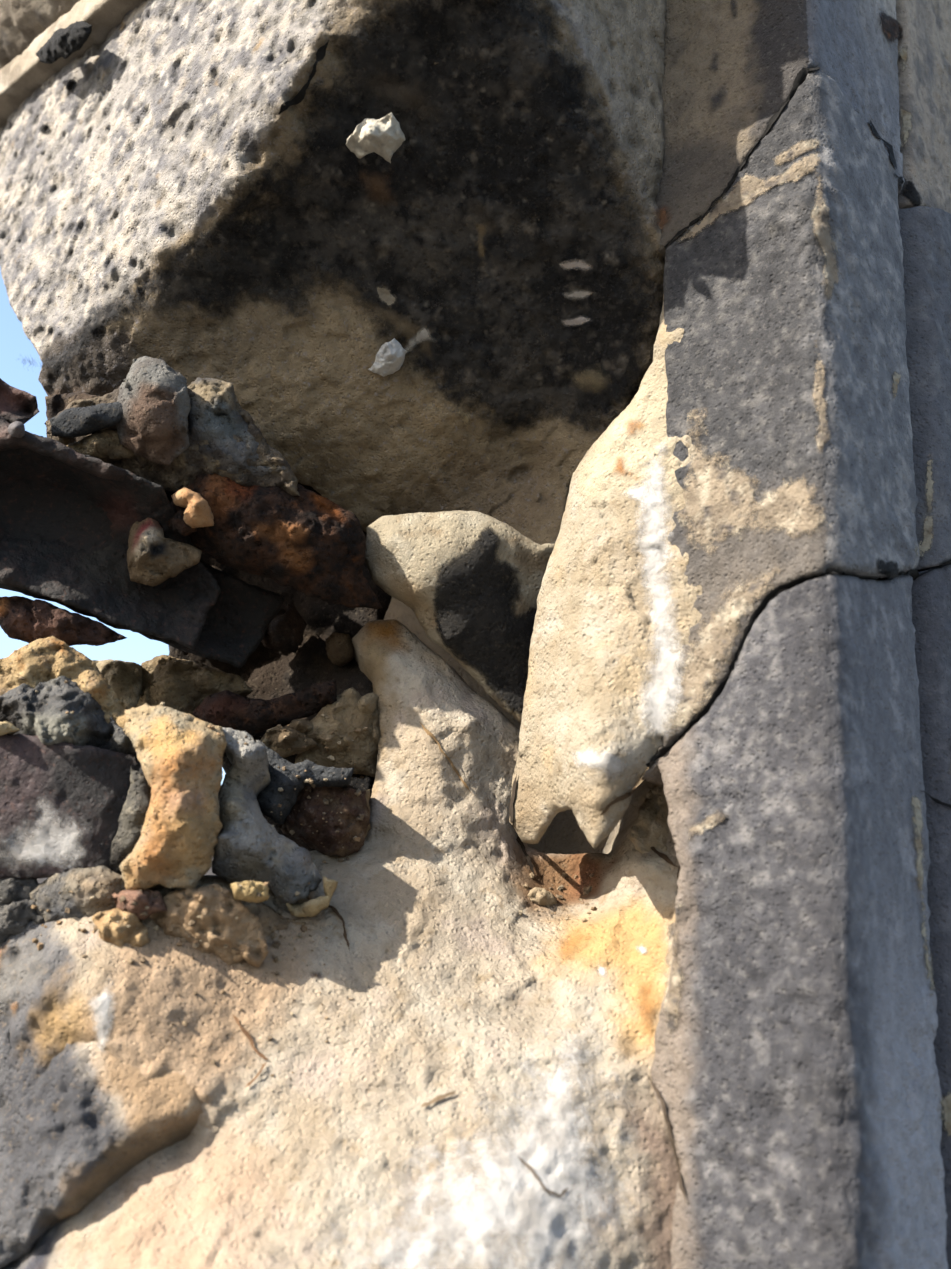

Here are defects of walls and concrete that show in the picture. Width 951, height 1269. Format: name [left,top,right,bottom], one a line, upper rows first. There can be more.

crack [664,67,820,249]
crack [869,120,897,169]
spalling [50,401,123,438]
rust [168,499,197,536]
water stain [627,445,682,733]
crack [509,293,951,874]
rust [0,596,127,646]
peeling [689,810,726,837]
crack [650,847,681,893]
spalling [0,619,684,1269]